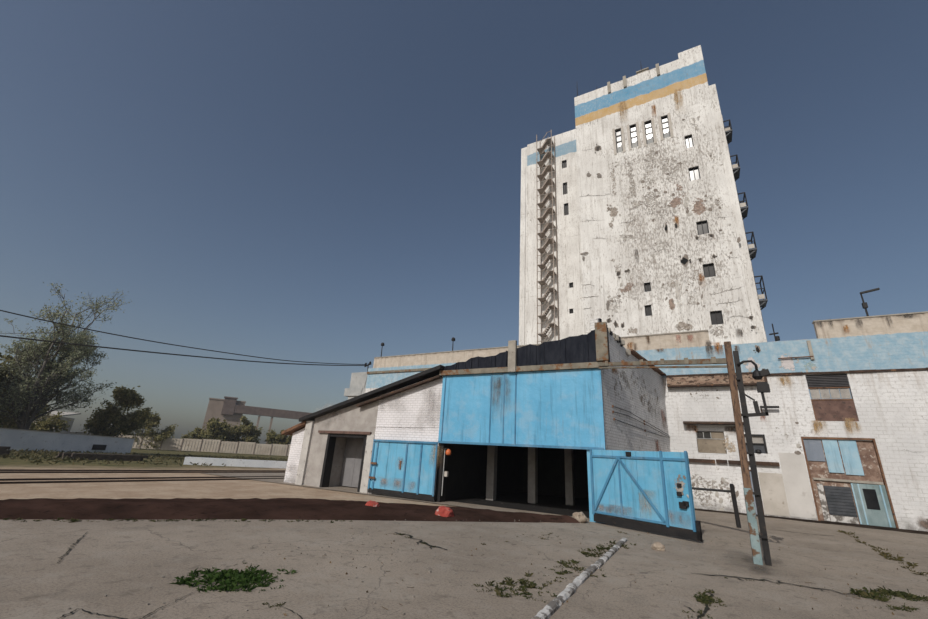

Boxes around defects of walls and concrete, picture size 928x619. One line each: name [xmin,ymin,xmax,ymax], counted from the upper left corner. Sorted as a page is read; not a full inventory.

peeling [587,150,723,310]
peeling [675,319,692,331]
peeling [743,345,761,372]
peeling [780,354,816,372]
peeling [674,474,739,511]